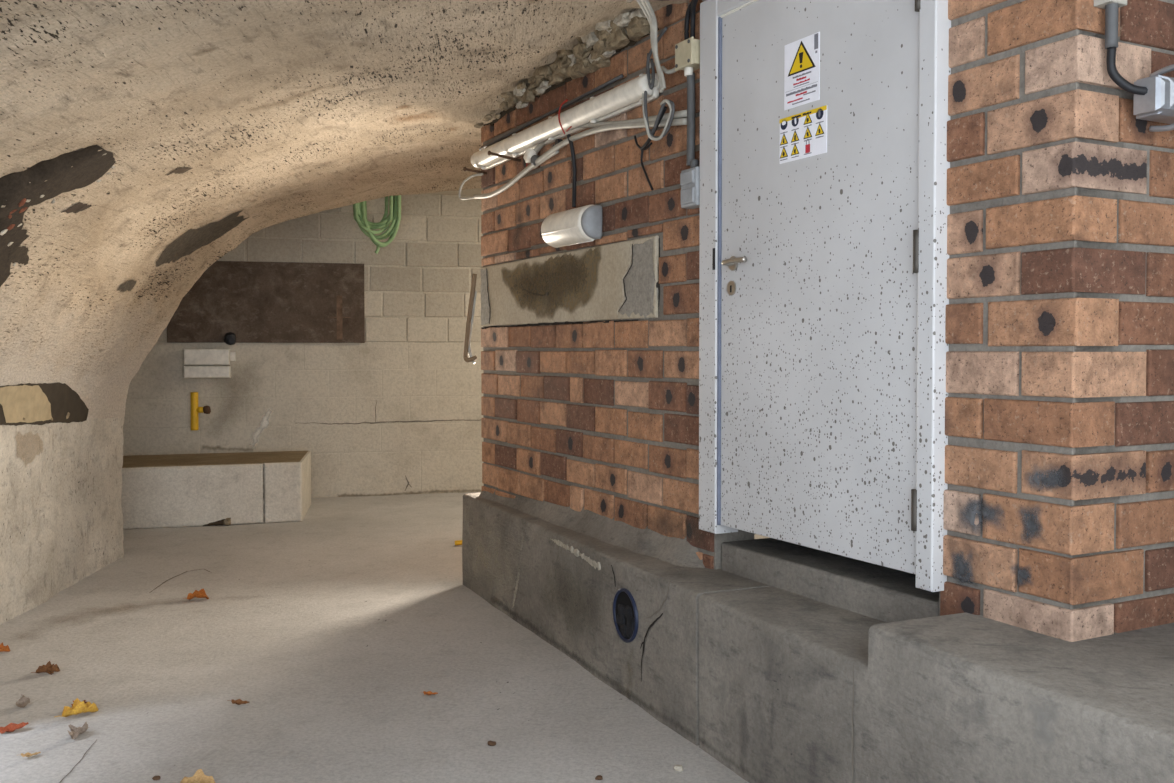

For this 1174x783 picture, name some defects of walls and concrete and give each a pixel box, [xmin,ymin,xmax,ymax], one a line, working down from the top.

leakage [502,248,600,317]
flaking render [617,239,659,320]
crack [640,580,671,682]